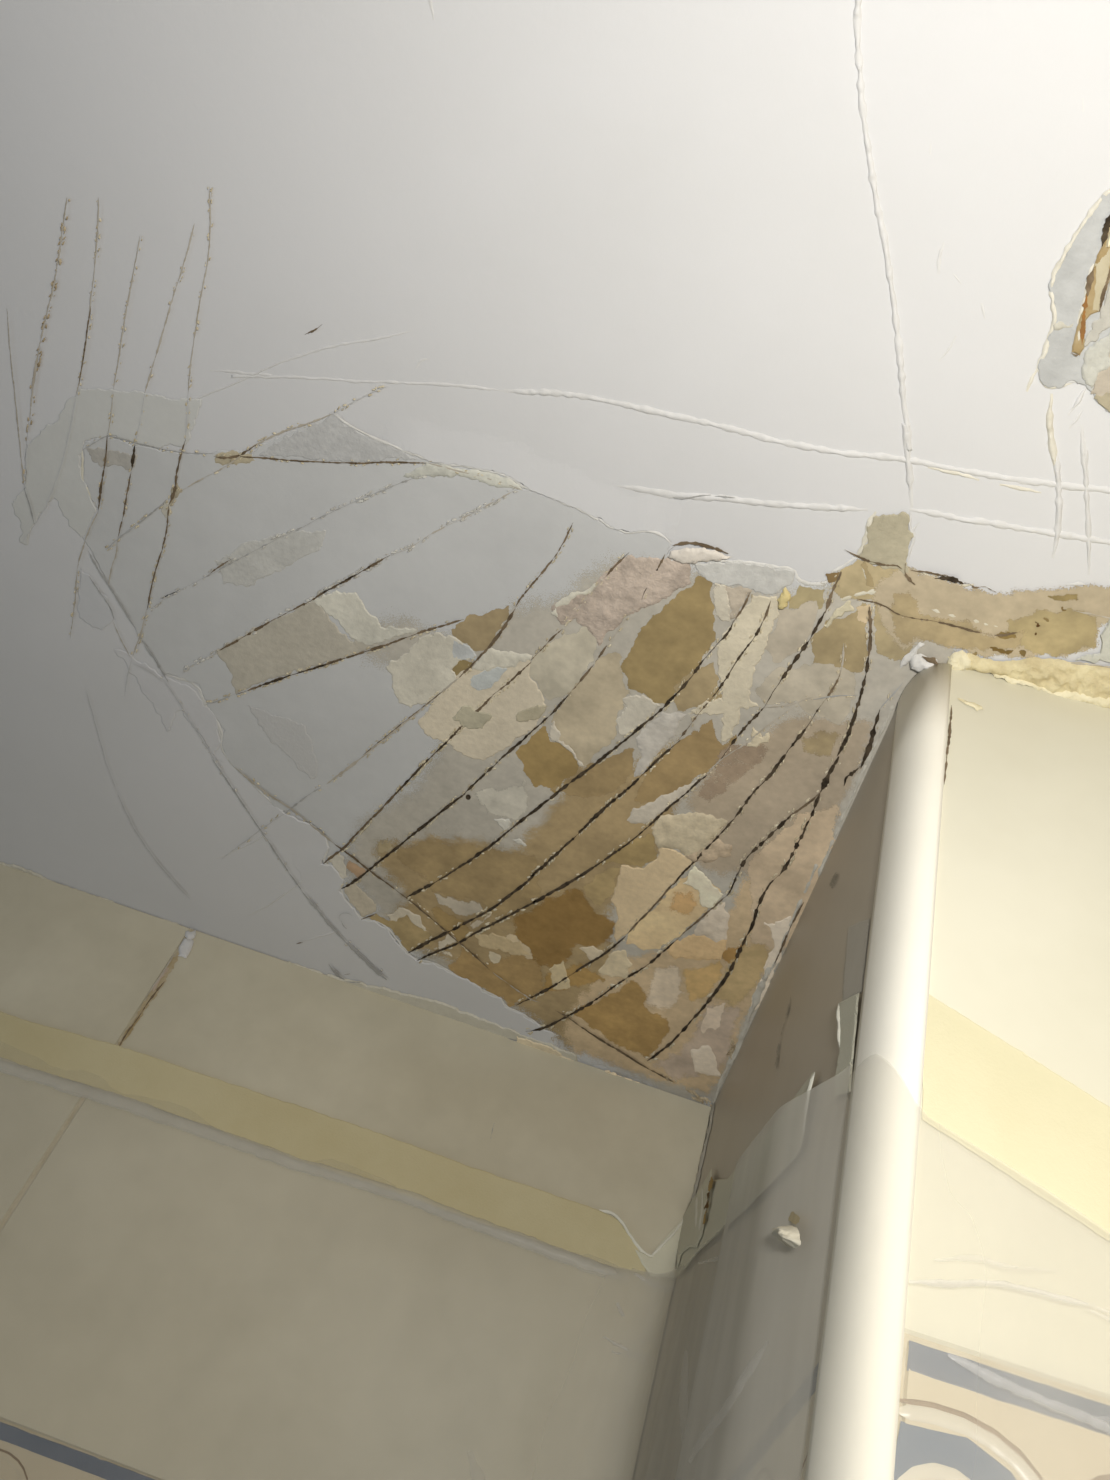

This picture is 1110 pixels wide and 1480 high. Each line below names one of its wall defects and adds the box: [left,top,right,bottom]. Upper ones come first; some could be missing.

peeling [12,388,956,1106]
crack [7,187,1018,1083]
peeling [1036,189,1110,412]